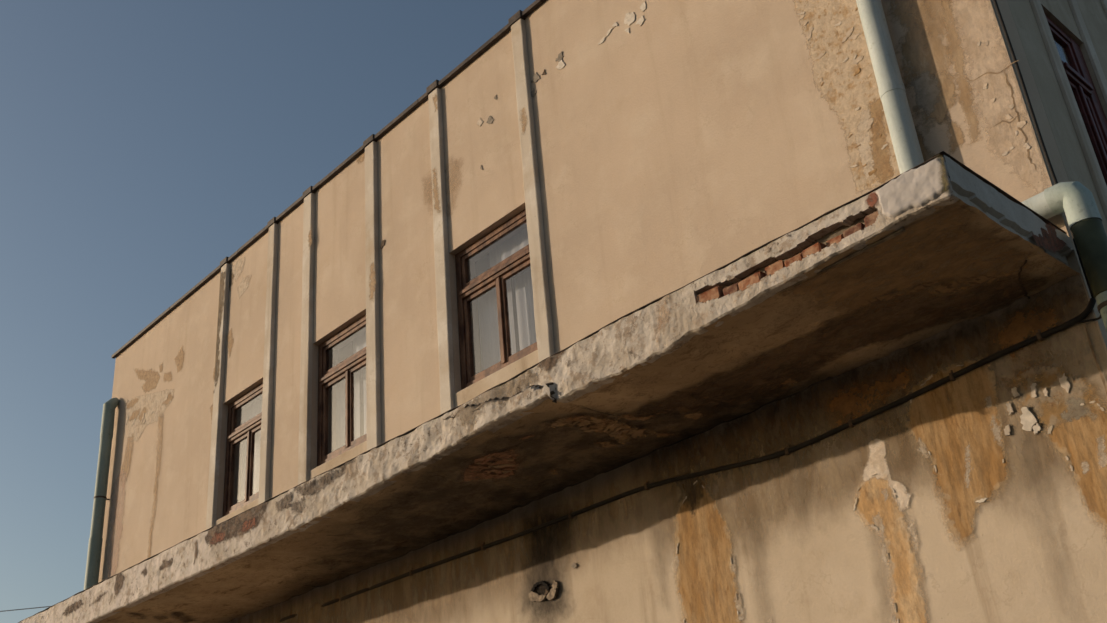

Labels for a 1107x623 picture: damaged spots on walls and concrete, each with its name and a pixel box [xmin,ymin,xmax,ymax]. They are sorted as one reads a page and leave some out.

peeling [697,0,906,303]
leakage [213,269,234,393]
peeling [125,348,184,441]
leakage [249,276,1097,623]
peeling [905,359,1107,545]
leakage [108,470,126,577]
flaking render [205,502,268,547]
spalling [528,580,559,602]
peeling [854,439,928,623]